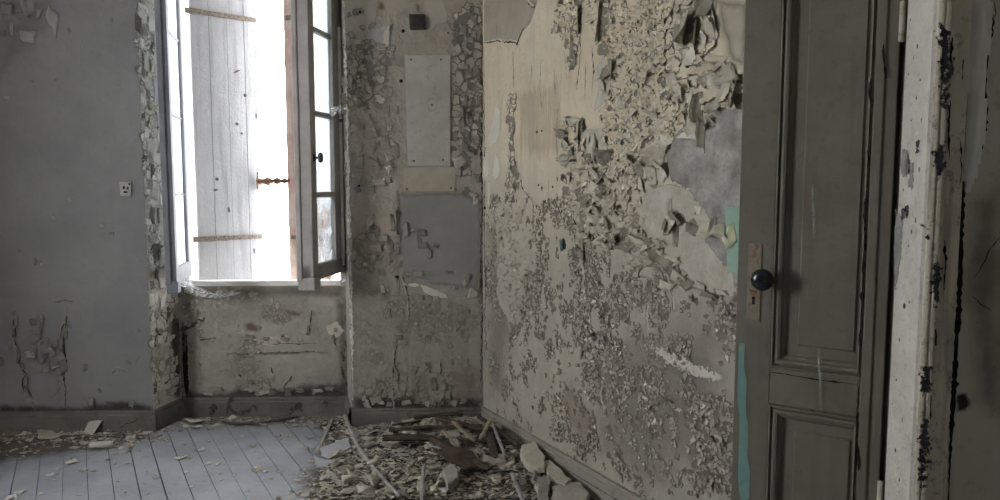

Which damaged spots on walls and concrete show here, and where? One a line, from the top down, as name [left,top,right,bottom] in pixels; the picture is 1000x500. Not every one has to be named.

peeling [0,0,71,44]
peeling [133,0,335,410]
peeling [325,0,743,500]
peeling [894,205,931,289]
peeling [929,240,948,309]
crack [12,300,74,408]
peeling [916,362,934,490]